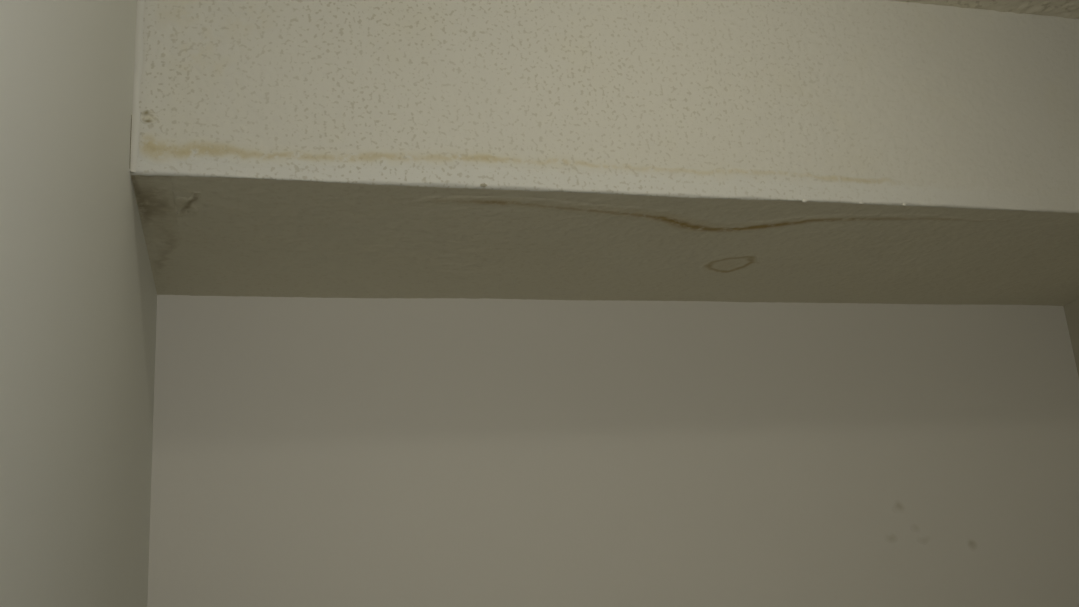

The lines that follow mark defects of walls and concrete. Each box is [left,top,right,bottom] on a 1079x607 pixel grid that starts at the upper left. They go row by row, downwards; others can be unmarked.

damp [132,109,904,276]
damp [418,195,1015,234]